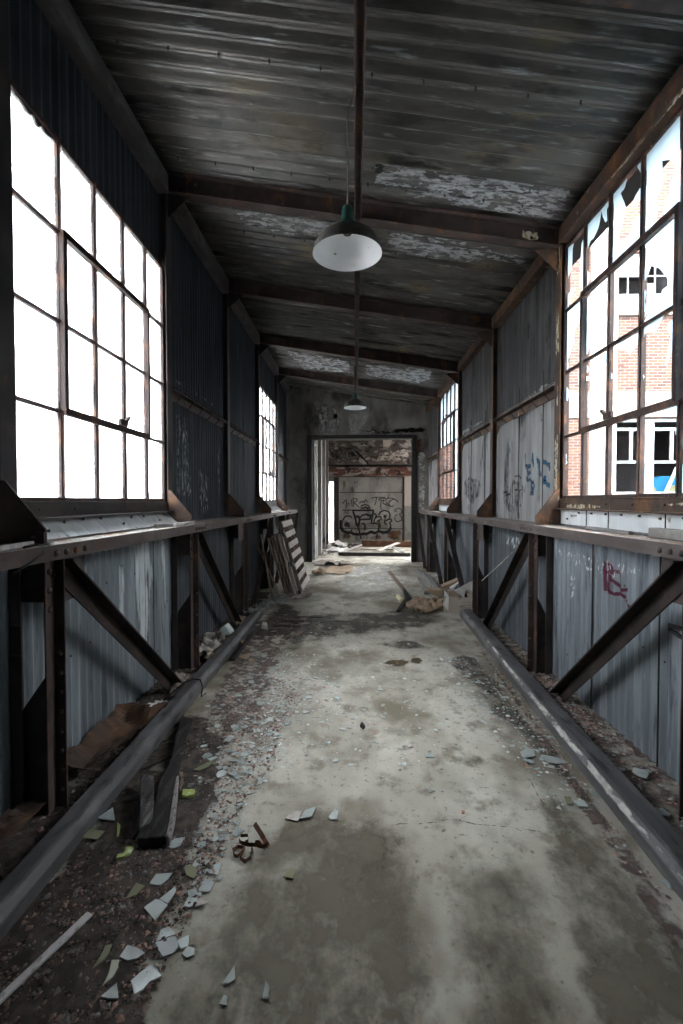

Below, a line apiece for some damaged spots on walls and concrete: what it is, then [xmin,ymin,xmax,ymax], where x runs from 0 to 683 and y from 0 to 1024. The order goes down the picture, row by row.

peeling [362,164,570,219]
peeling [235,209,330,236]
peeling [385,233,526,268]